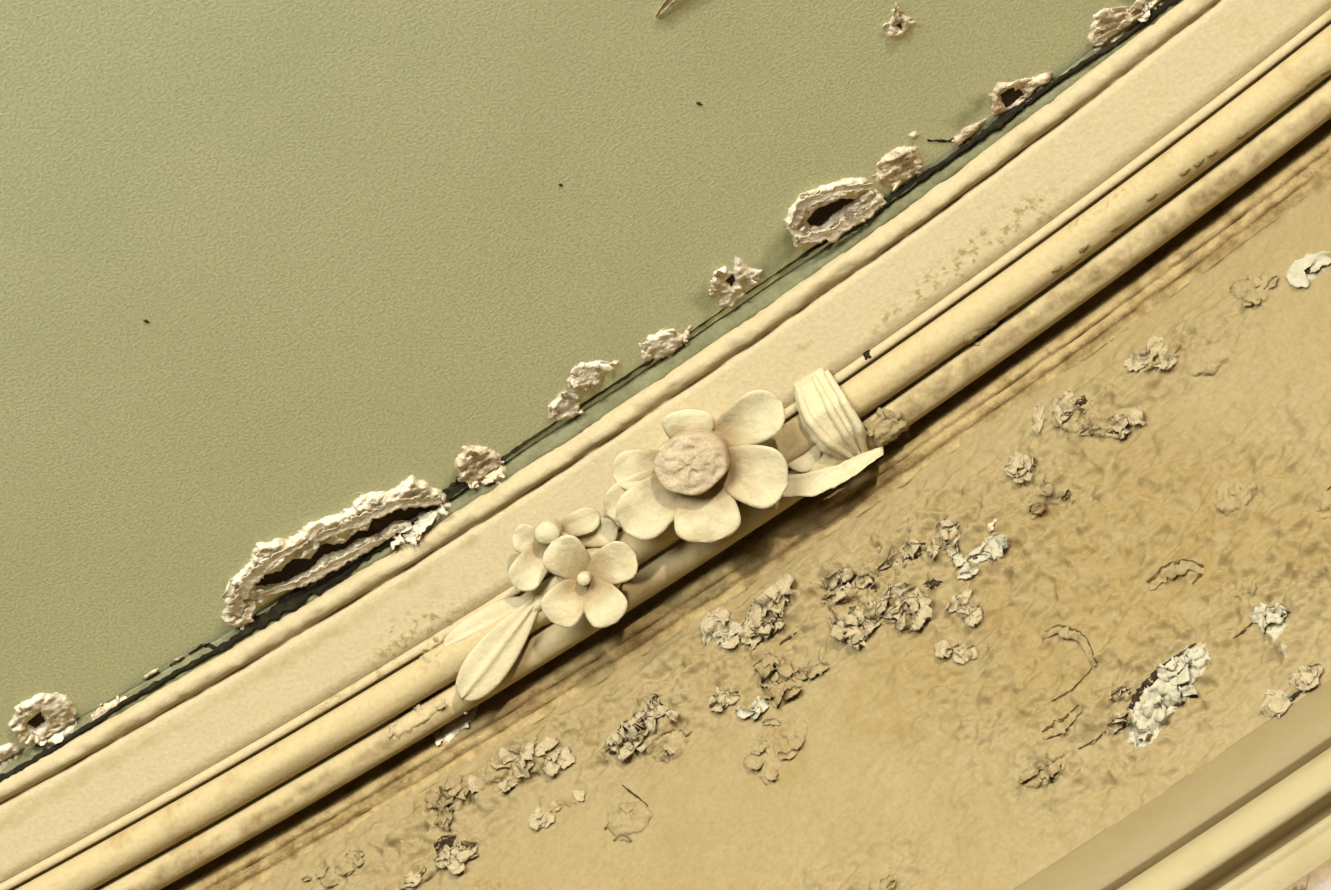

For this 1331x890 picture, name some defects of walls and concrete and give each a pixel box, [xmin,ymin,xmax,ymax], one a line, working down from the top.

peeling [1086,0,1165,51]
peeling [951,71,1053,147]
peeling [783,131,923,250]
peeling [709,256,764,308]
peeling [547,360,620,423]
peeling [1031,391,1145,441]
peeling [454,445,506,489]
peeling [221,475,451,630]
peeling [699,518,1010,720]
peeling [0,692,127,772]
flaking render [1104,643,1211,748]
peeling [380,736,576,890]